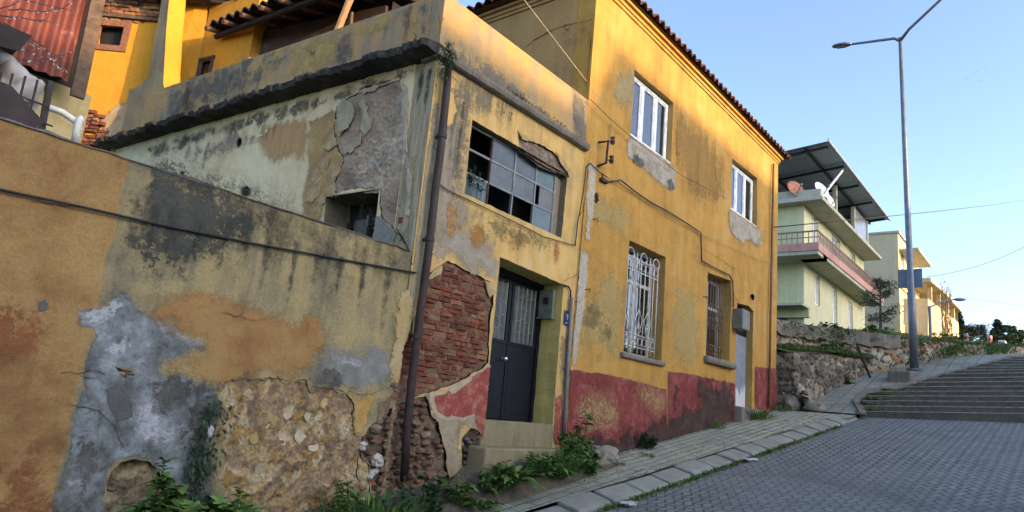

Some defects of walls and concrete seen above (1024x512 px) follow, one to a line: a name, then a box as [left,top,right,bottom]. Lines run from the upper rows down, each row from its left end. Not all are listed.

damp [128,70,414,307]
flaking render [216,61,496,512]
peeling [554,395,563,445]
peeling [579,394,617,431]
flaking render [104,459,161,512]